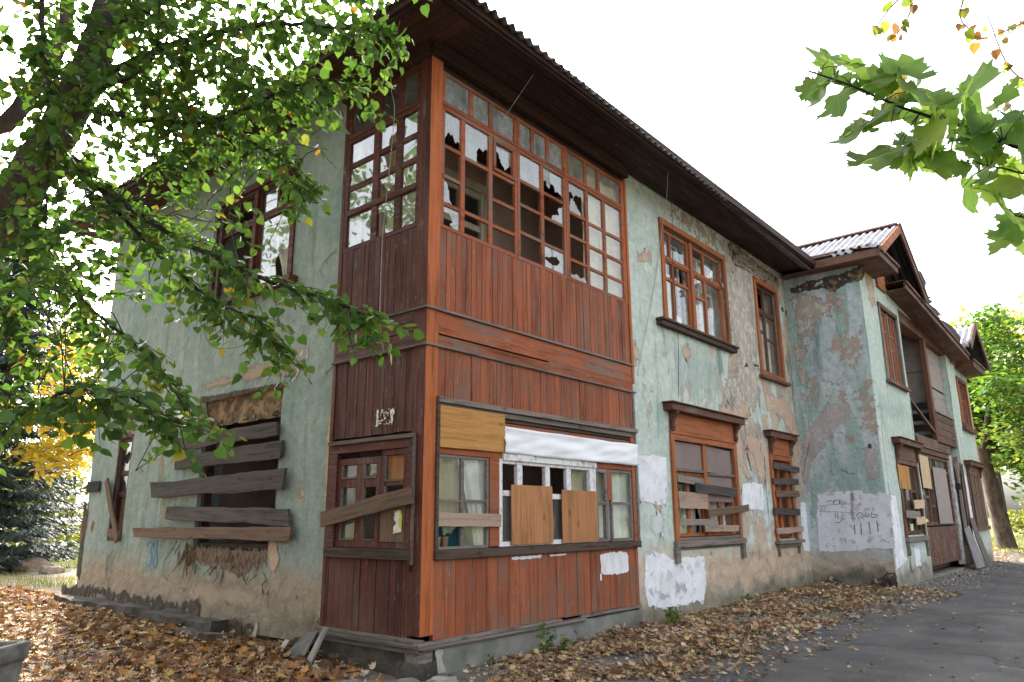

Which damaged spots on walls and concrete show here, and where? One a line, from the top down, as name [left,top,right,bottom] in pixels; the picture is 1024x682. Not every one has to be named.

peeling [198,347,309,425]
peeling [668,207,880,493]